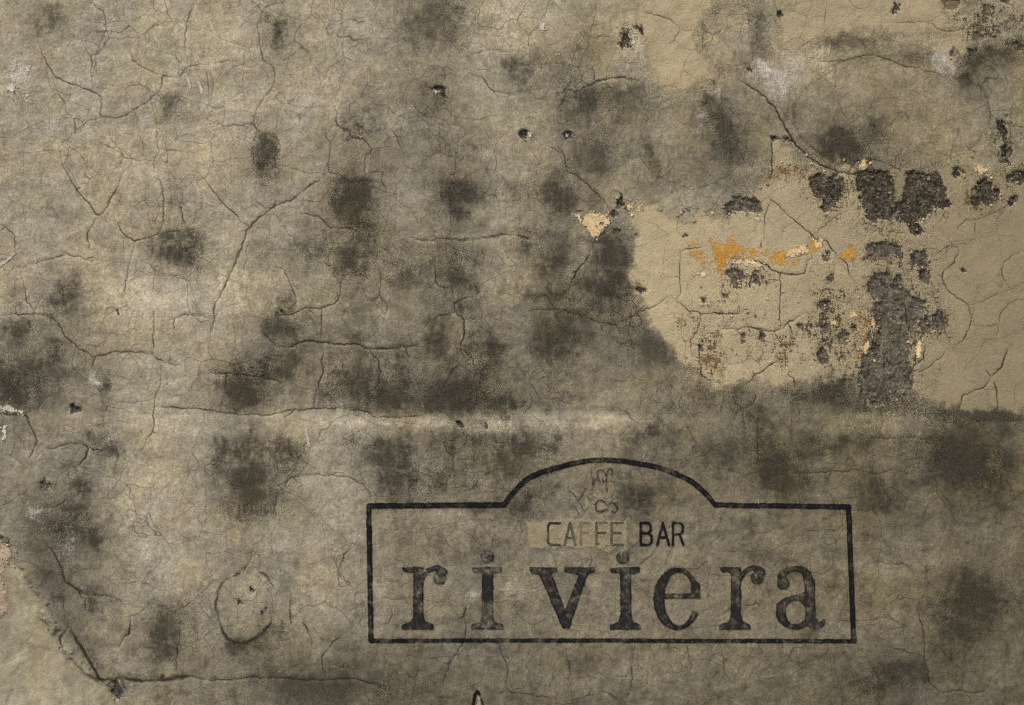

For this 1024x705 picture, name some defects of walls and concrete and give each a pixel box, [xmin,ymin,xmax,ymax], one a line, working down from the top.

damp [753,53,804,100]
damp [255,134,279,168]
crack [745,83,901,181]
crack [13,125,372,367]
damp [216,296,308,410]
crack [150,269,418,435]
damp [575,232,633,307]
corrosion [685,235,821,274]
crack [679,200,849,407]
peeling [572,114,1024,415]
damp [213,437,295,521]
crack [59,630,373,688]